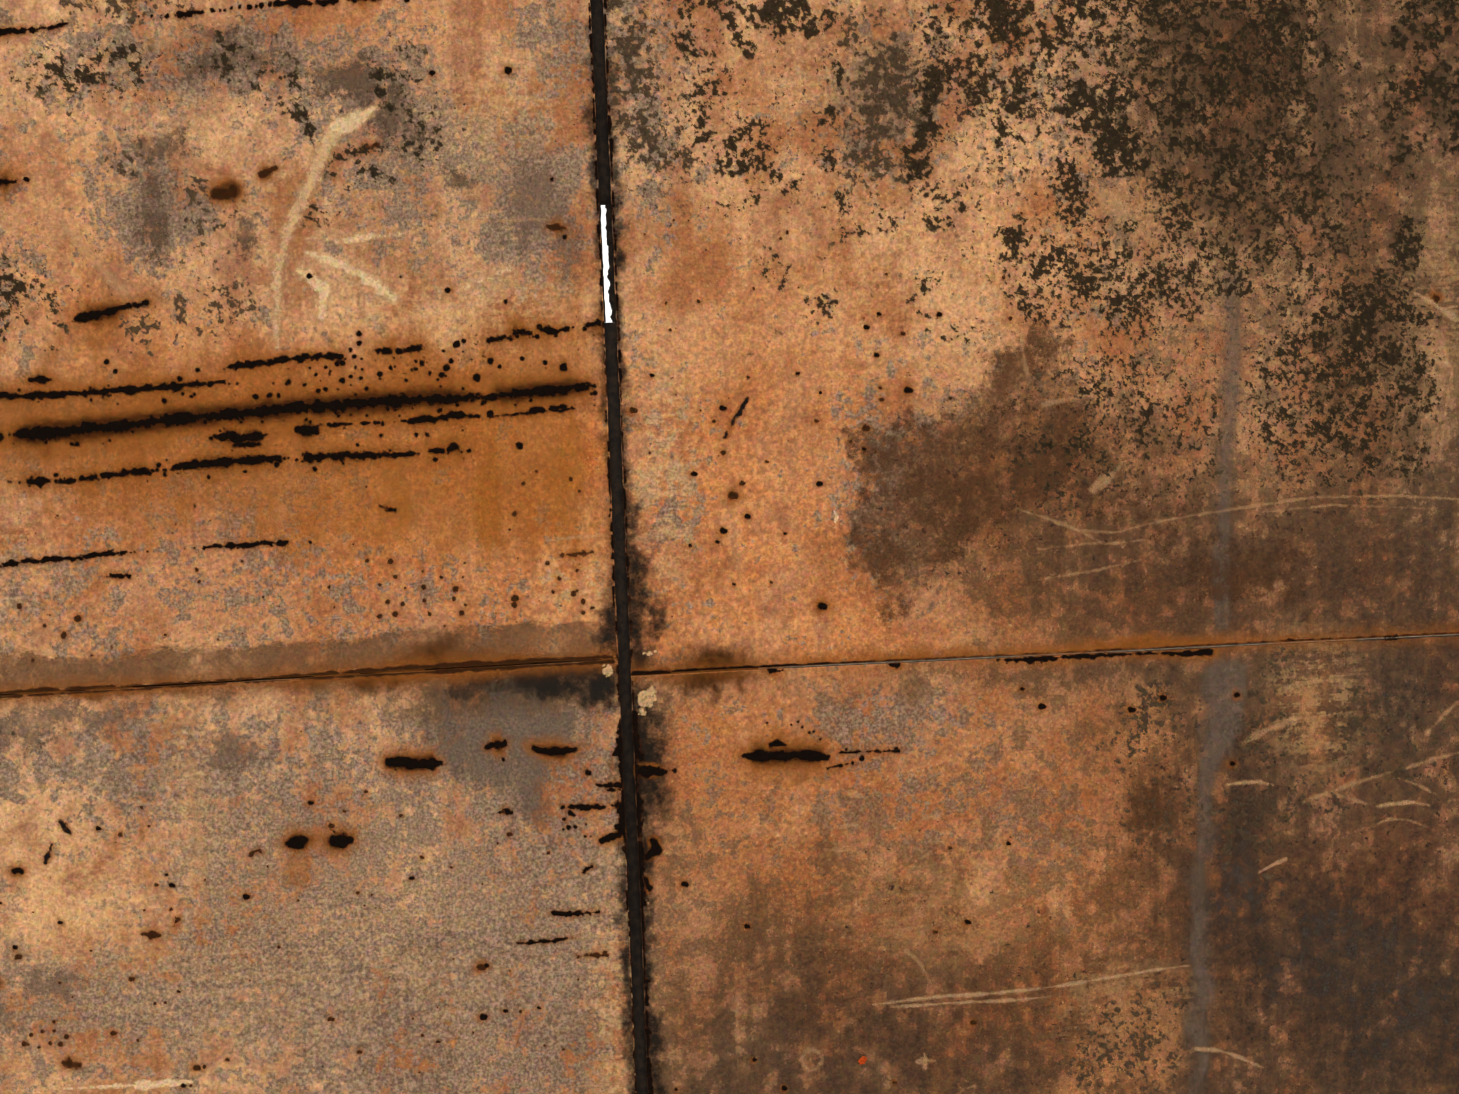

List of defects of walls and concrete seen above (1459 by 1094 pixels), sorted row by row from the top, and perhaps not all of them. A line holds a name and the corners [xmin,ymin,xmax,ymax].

corrosion [0,0,638,662]
water stain [836,321,1329,634]
corrosion [0,642,620,706]
corrosion [381,751,438,776]
corrosion [529,742,574,762]
corrosion [282,810,356,854]
corrosion [560,718,631,937]
corrosion [8,866,26,877]
corrosion [141,916,181,940]
corrosion [516,937,568,945]
corrosion [576,951,609,959]
corrosion [61,1057,82,1070]